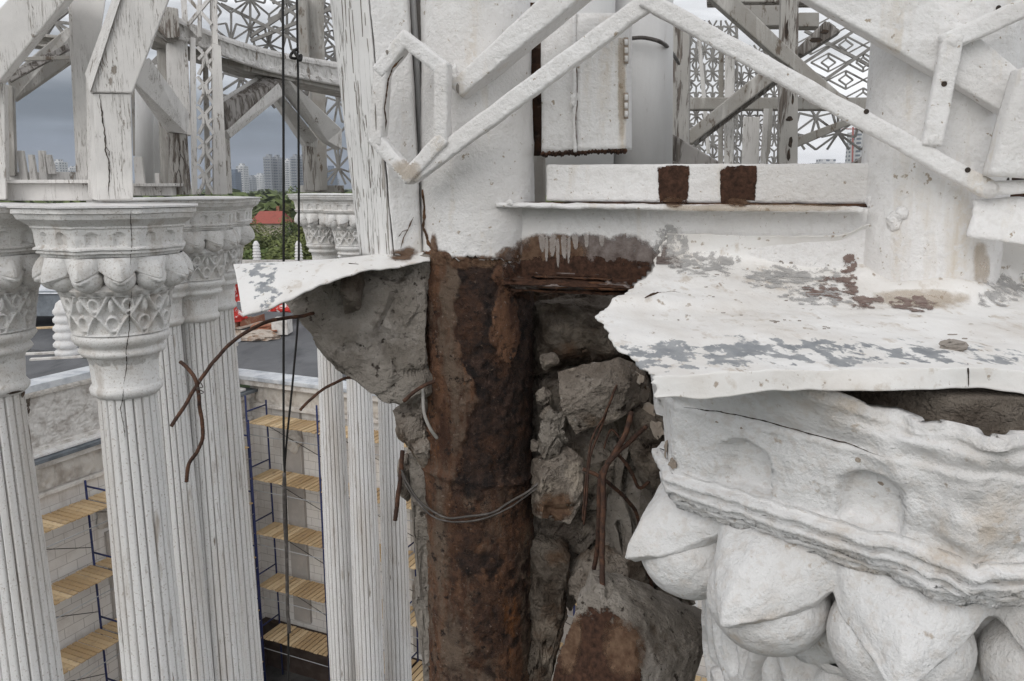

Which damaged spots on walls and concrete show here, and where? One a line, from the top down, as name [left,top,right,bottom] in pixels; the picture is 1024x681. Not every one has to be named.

crack [99,94,110,199]
corrosion [657,165,690,207]
corrosion [720,165,757,207]
peeling [653,225,935,312]
peeling [979,273,1024,307]
crack [120,292,132,436]
spalling [299,376,351,411]
crack [684,407,880,456]
spalling [582,372,677,586]
corrosion [553,607,646,681]